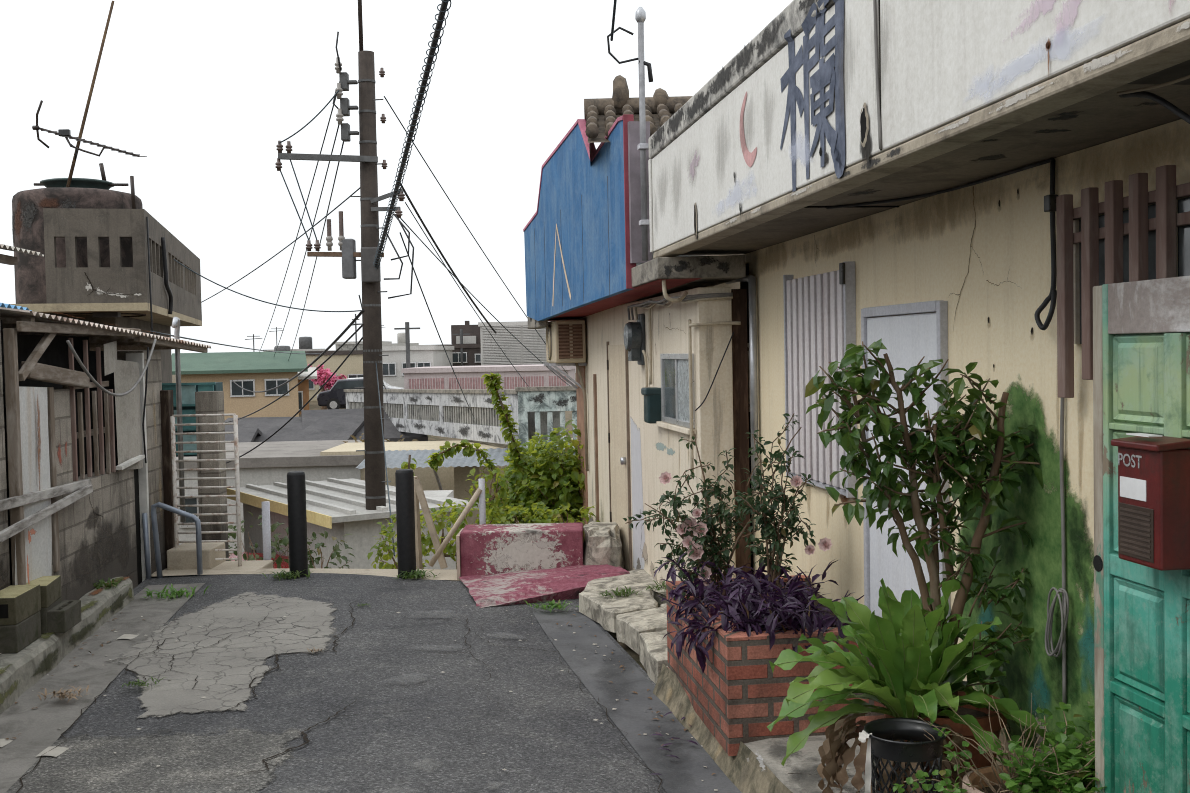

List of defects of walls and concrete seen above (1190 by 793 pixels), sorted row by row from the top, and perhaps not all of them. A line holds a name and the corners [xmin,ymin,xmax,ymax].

water stain [651,19,782,148]
corrosion [12,198,77,245]
crack [952,186,1013,330]
peeling [477,534,568,575]
spalling [583,417,666,589]
crack [16,603,355,793]
crack [211,618,662,793]